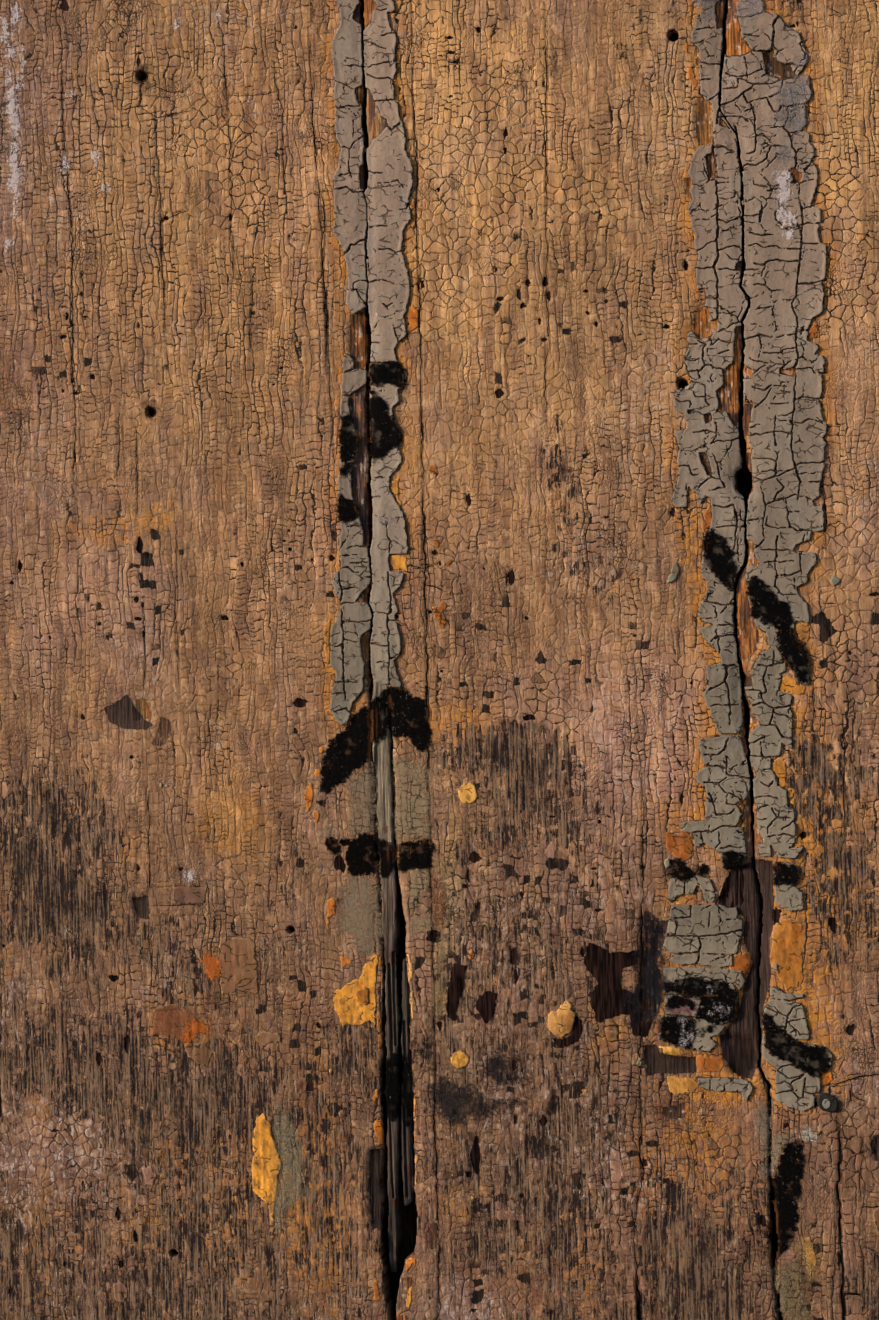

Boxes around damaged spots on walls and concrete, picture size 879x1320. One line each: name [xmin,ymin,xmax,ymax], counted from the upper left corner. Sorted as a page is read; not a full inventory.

peeling [323,0,425,725]
peeling [396,1250,416,1320]
peeling [552,0,835,1178]
peeling [828,917,837,934]